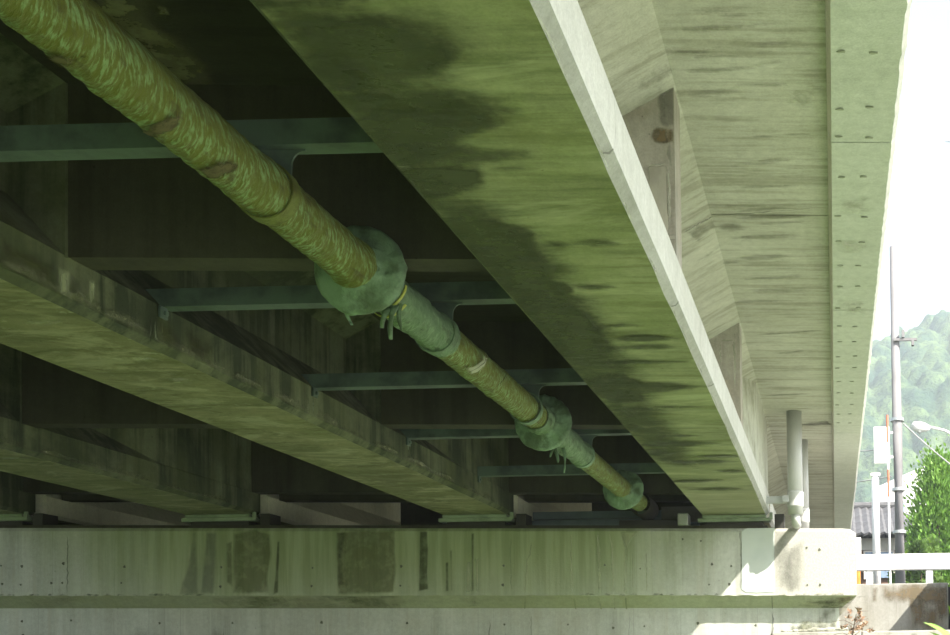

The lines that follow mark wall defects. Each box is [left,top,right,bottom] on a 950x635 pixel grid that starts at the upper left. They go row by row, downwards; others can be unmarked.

water stain [252,0,742,491]
rust [653,129,673,142]